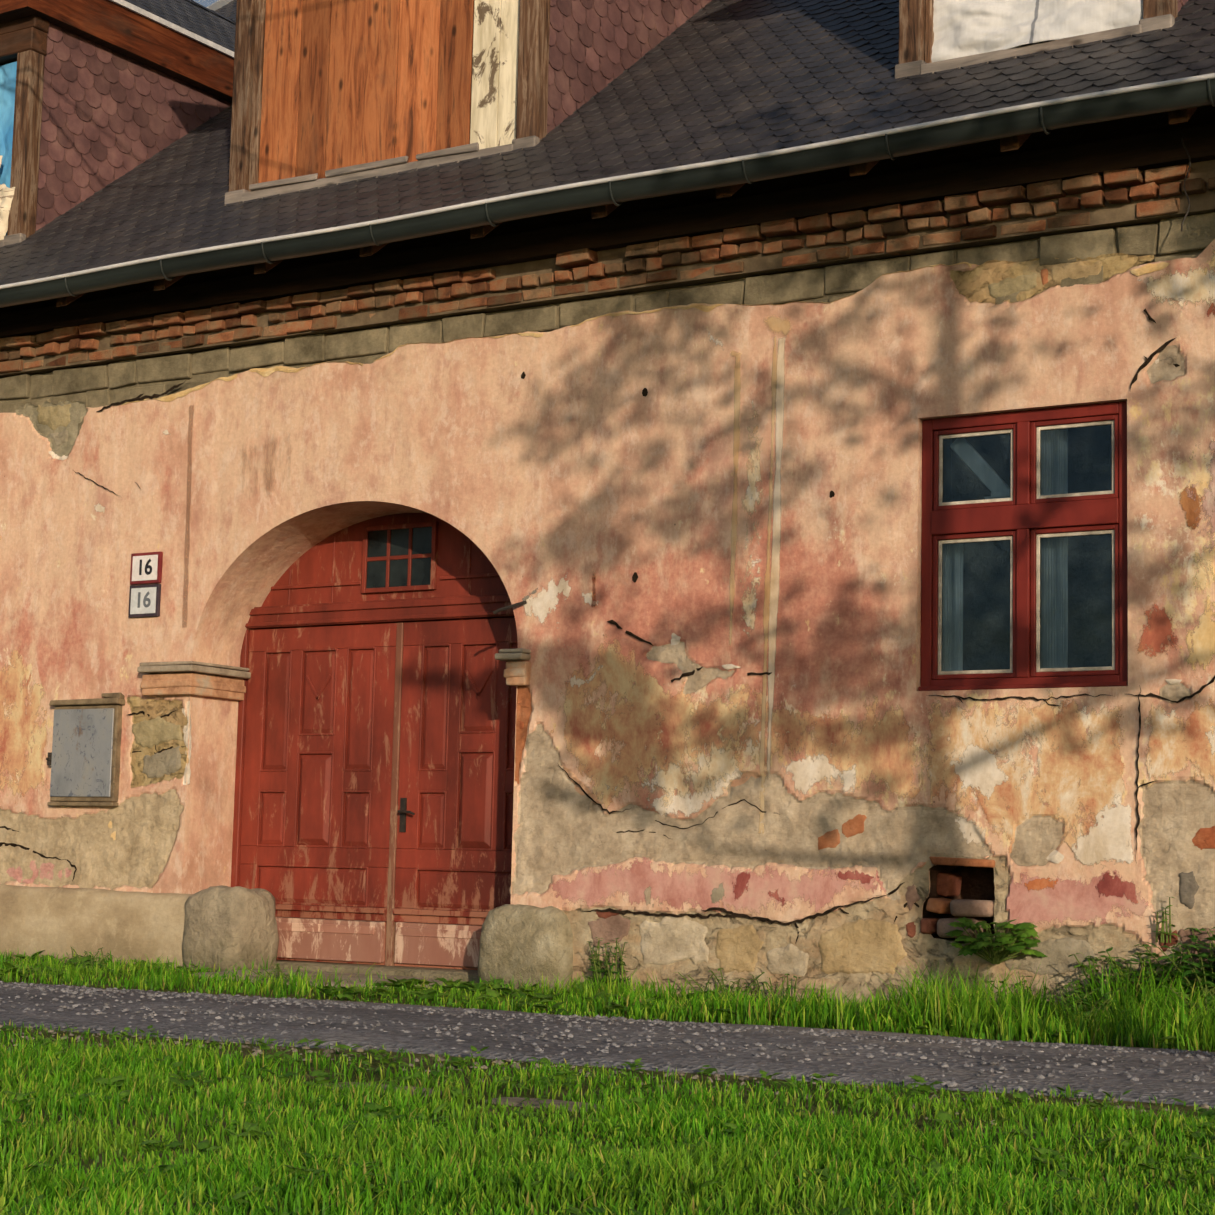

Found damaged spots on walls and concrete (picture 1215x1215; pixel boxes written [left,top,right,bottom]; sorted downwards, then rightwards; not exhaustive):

spalling [0,212,1215,460]
peeling [522,575,599,623]
crack [607,620,653,646]
crack [671,667,702,682]
peeling [739,401,763,636]
crack [747,670,772,678]
peeling [1138,440,1215,670]
crack [0,826,77,882]
spalling [0,648,192,890]
spalling [510,633,1215,1009]
crack [928,676,1215,863]